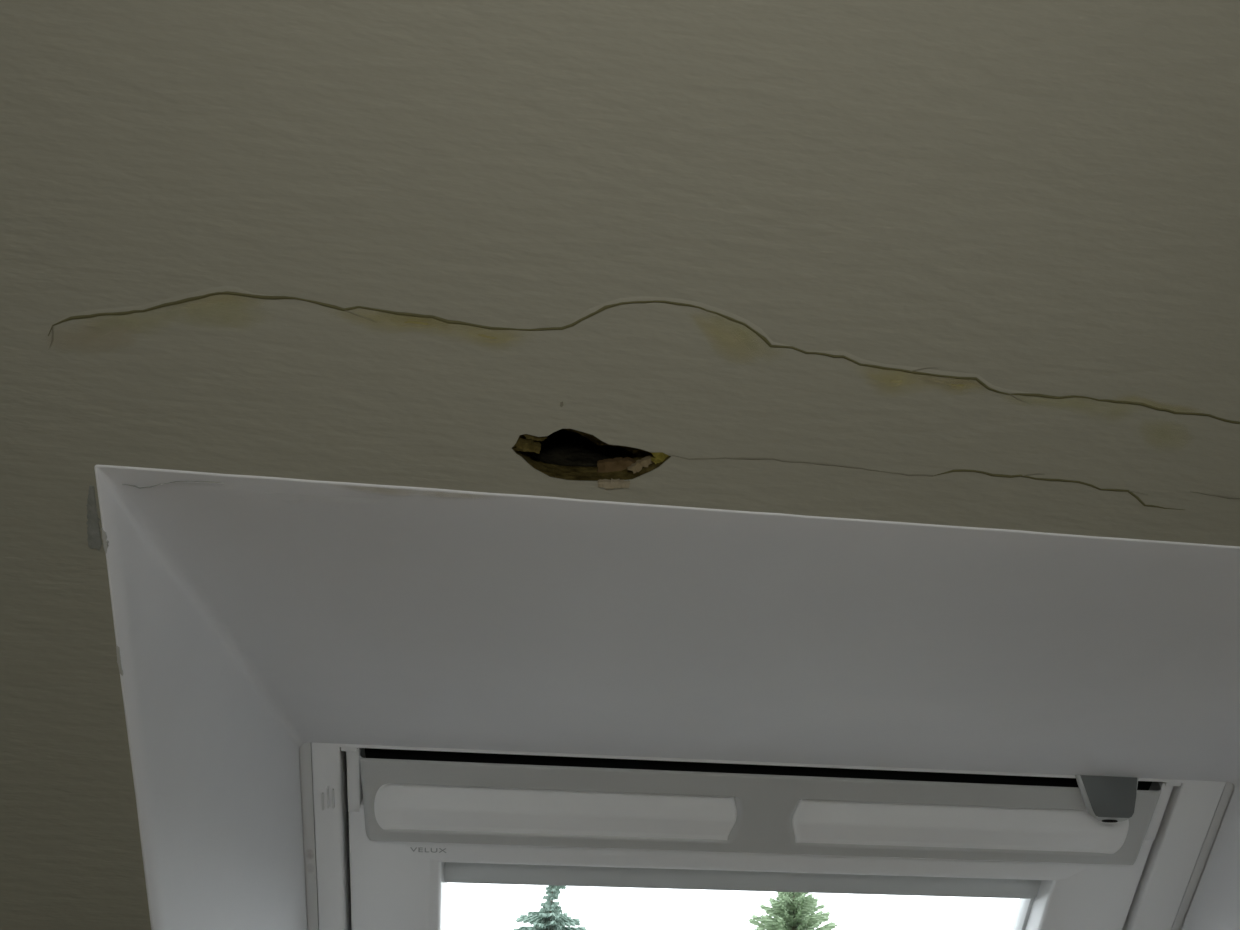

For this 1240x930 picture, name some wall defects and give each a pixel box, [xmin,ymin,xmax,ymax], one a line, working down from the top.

crack [48,286,1240,424]
spalling [514,429,669,490]
crack [669,454,1240,510]